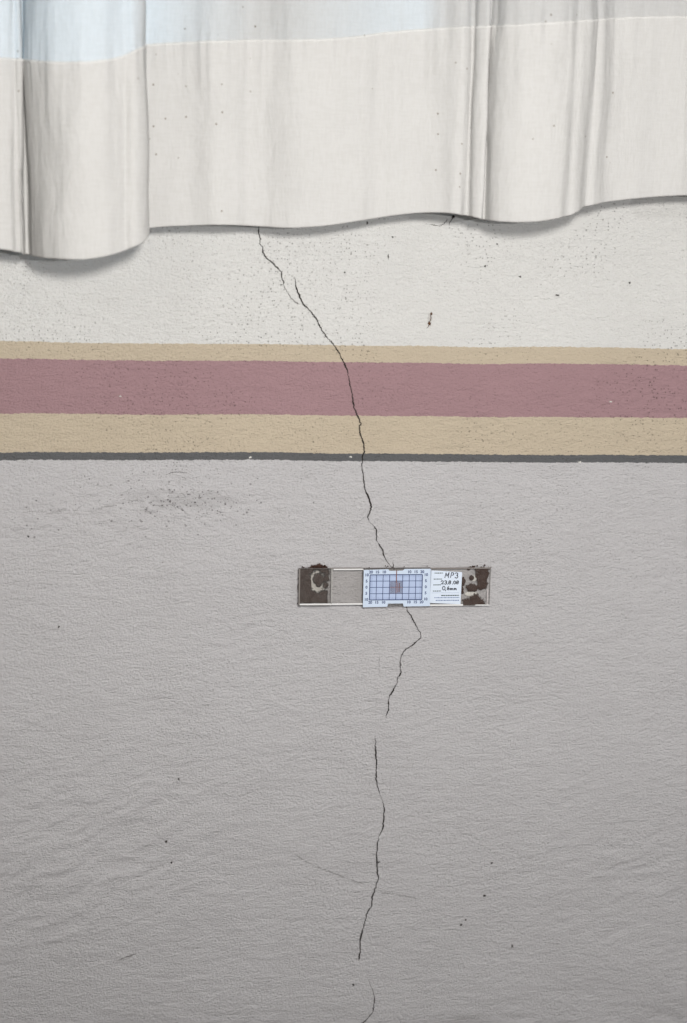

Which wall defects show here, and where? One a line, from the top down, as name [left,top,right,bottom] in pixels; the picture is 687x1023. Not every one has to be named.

crack [258,227,394,568]
crack [358,606,423,959]